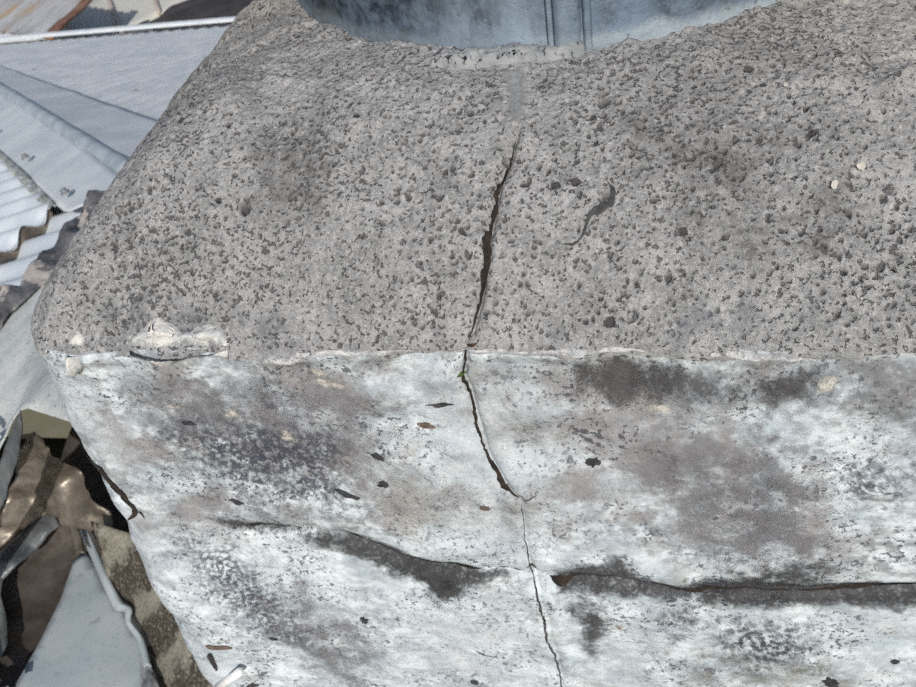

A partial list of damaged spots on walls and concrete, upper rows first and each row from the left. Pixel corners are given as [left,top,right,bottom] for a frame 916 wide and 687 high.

crack [246,137,617,687]
crack [650,582,916,593]